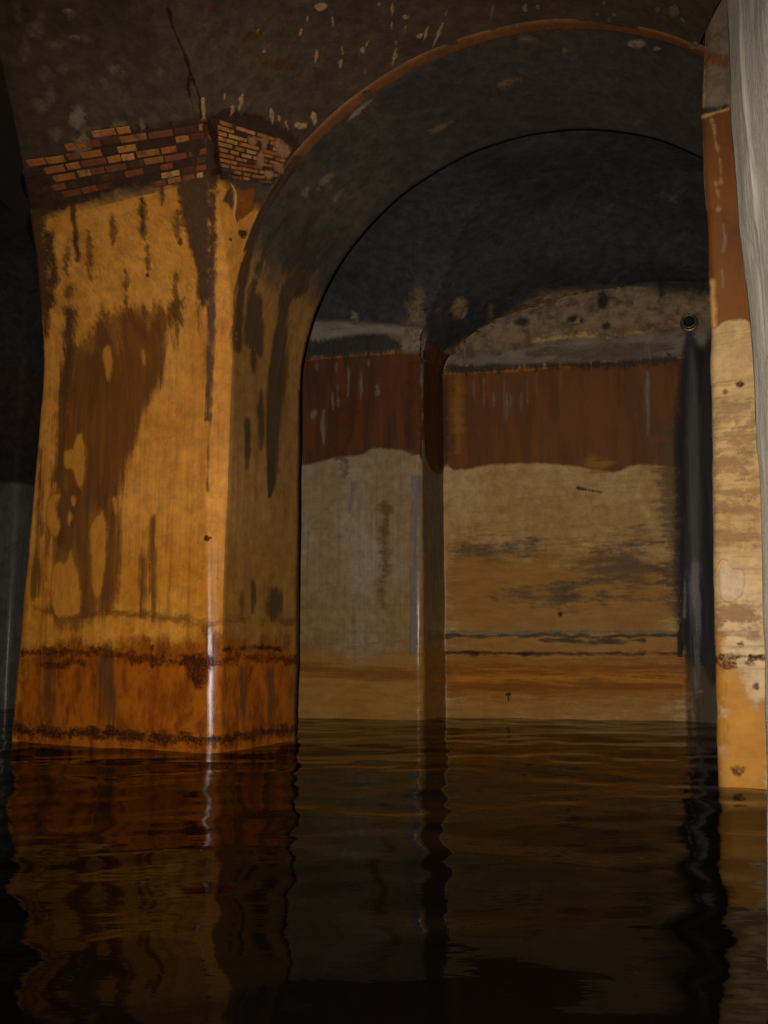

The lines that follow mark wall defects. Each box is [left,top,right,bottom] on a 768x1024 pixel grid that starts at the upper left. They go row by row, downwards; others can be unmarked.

leakage [26,197,183,630]
flaking render [21,104,301,241]
crack [166,7,222,175]
leakage [173,168,217,421]
leakage [232,108,332,498]
corrosion [300,342,684,473]
corrosion [701,108,750,328]
corrosion [13,628,446,753]
leakage [240,581,282,619]
leakage [444,326,765,723]